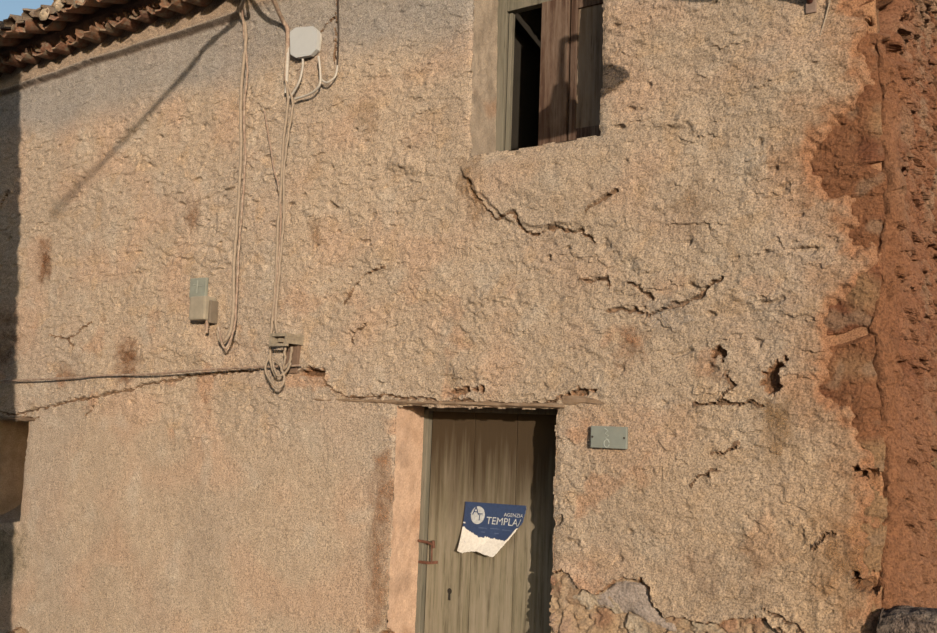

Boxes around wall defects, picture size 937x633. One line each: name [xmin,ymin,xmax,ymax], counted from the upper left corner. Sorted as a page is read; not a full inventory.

crack [466,177,619,243]
crack [579,276,723,318]
flaking render [809,10,888,623]
crack [0,368,260,418]
crack [693,371,764,408]
hole [763,366,783,393]
flaking render [549,571,779,633]